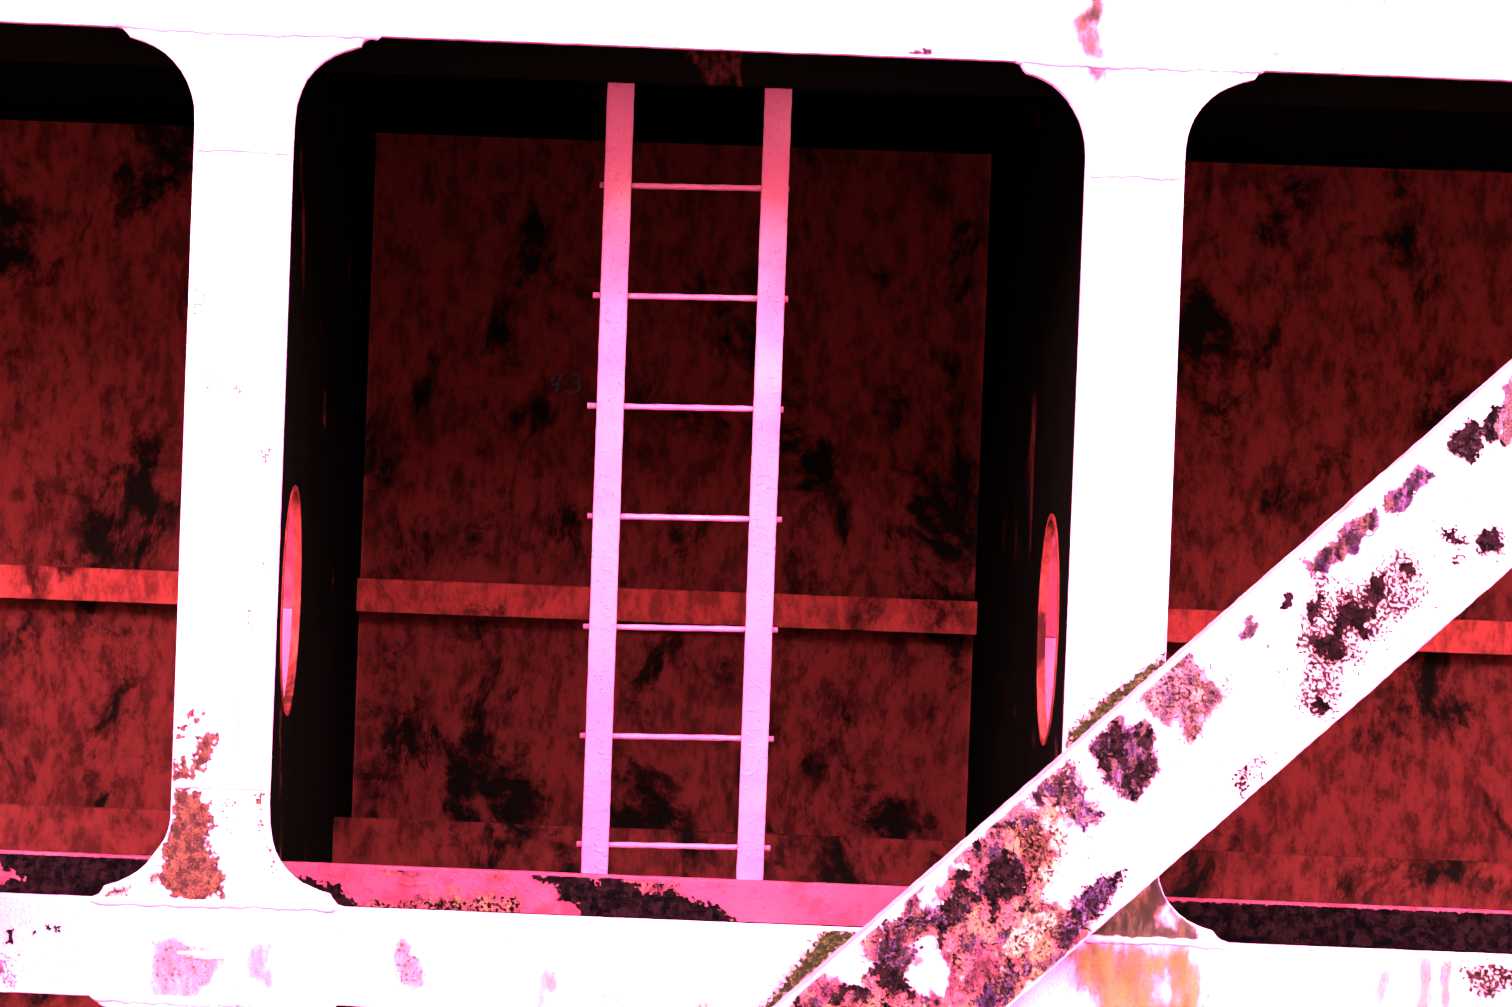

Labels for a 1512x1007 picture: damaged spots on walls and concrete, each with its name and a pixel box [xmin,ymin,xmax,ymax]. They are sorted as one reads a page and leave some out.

rust [789,373,1512,1007]
rust [105,884,132,897]
rust [149,709,278,901]
damp [1069,943,1205,1007]